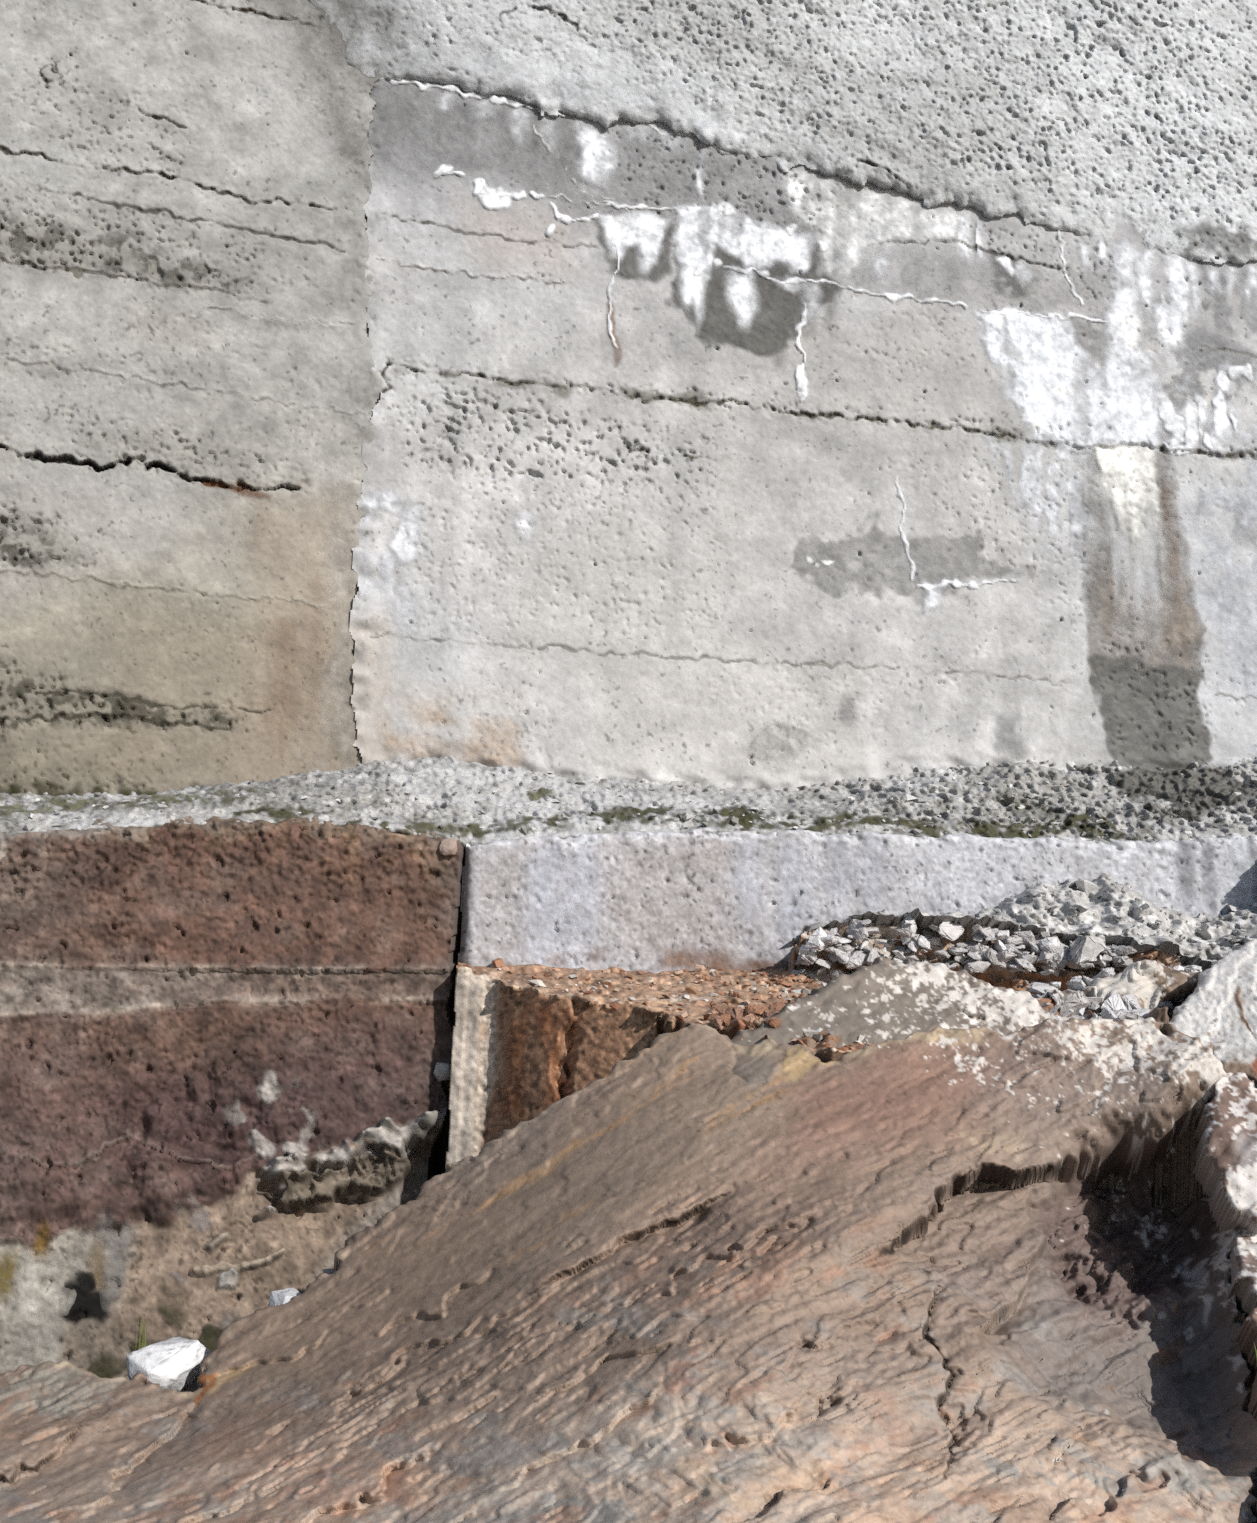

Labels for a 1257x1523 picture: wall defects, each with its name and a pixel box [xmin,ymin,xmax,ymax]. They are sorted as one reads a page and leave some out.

crack [196,0,295,20]
water stain [271,0,390,59]
crack [0,146,55,161]
crack [73,125,628,347]
crack [333,365,422,414]
crack [459,373,531,386]
crack [631,303,1094,451]
crack [0,445,297,492]
water stain [321,49,1257,832]
crack [1130,444,1257,460]